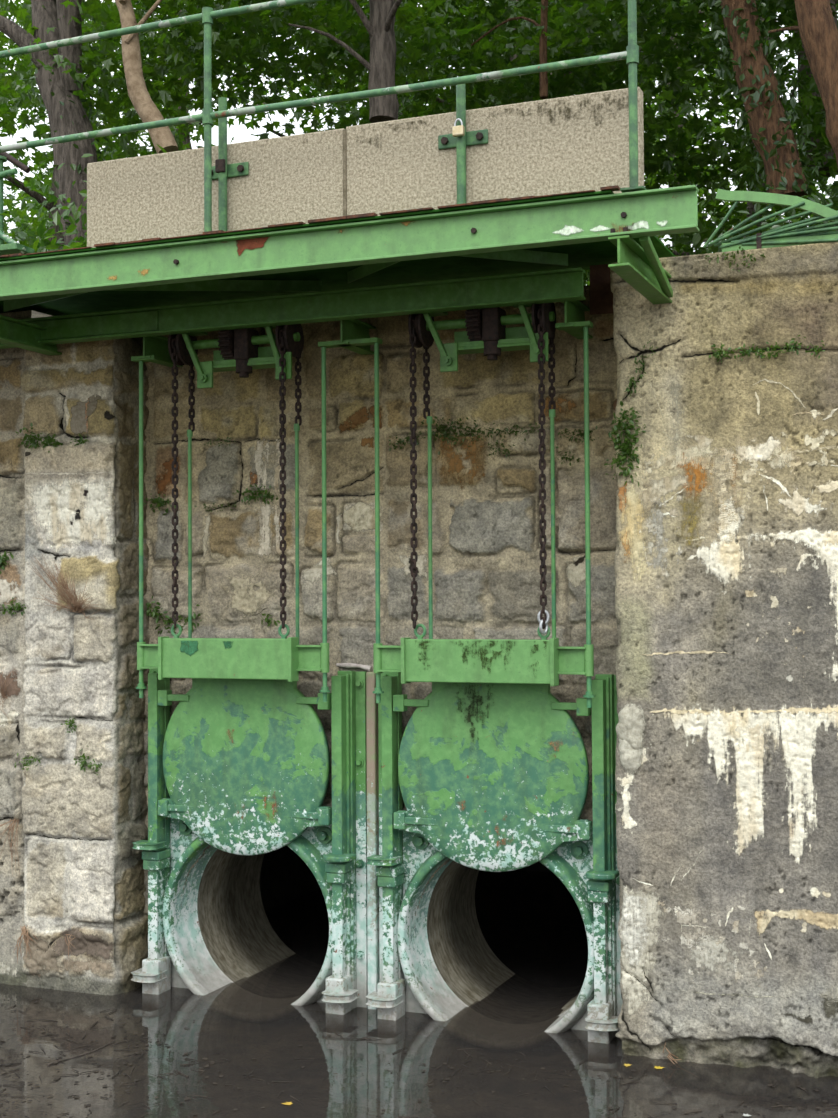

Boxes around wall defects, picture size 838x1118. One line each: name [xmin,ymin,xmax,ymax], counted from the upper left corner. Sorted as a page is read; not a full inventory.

rust [0,185,620,258]
crack [601,334,838,400]
rust [678,454,714,547]
damp [686,456,838,639]
damp [615,744,652,834]
damp [651,703,838,863]
spalling [618,878,838,1018]